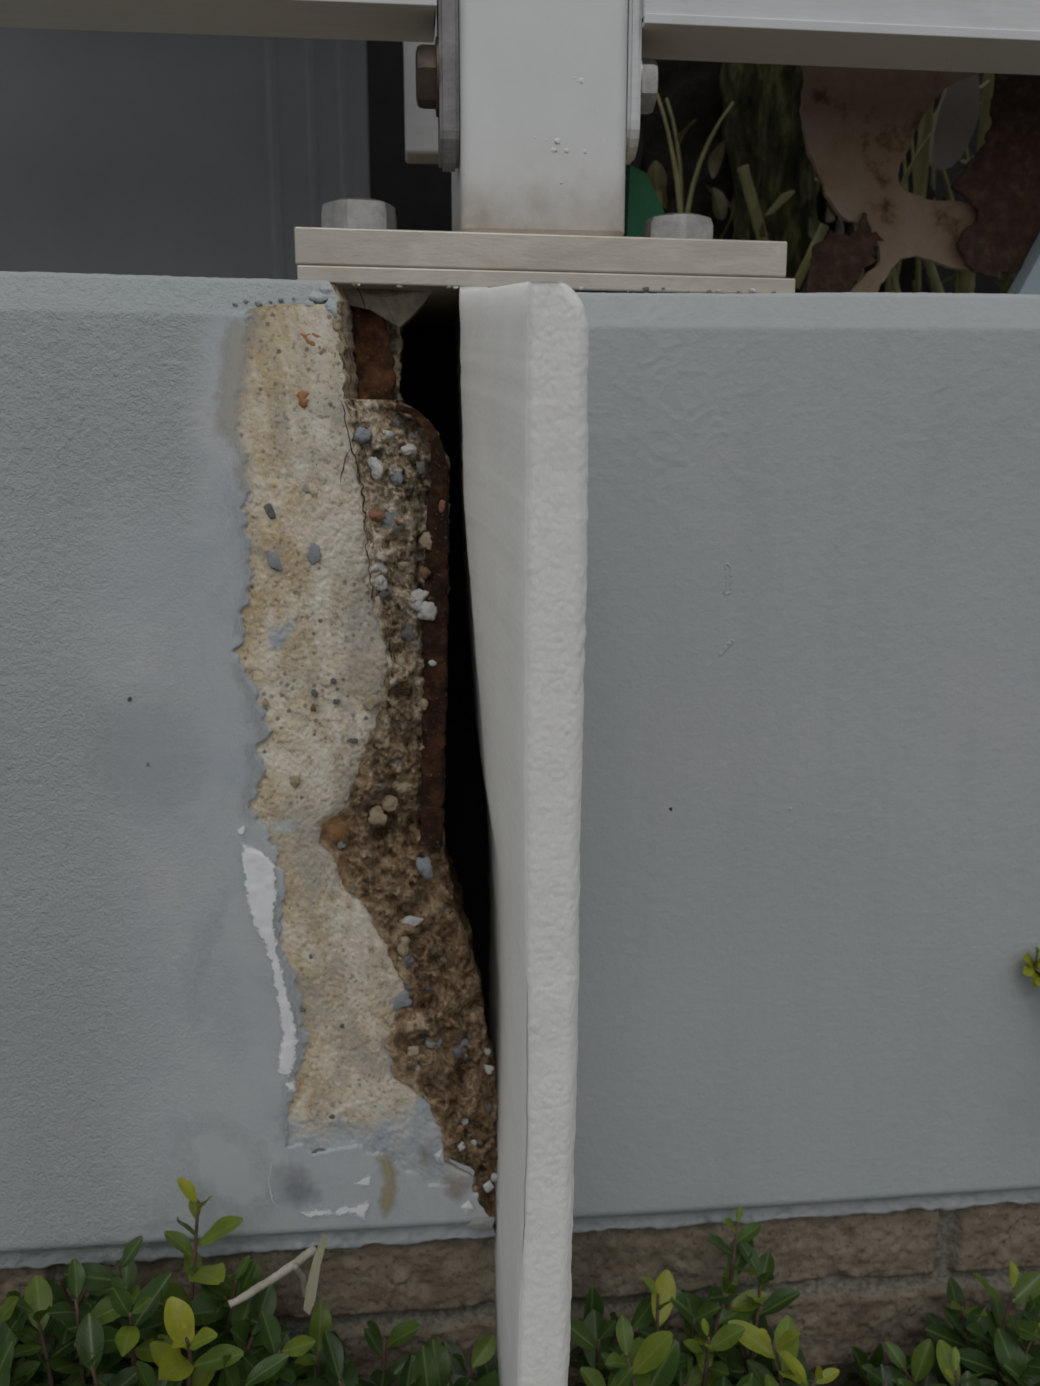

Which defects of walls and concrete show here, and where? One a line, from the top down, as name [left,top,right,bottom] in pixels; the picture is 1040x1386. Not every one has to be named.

spalling [220,284,498,1230]
rust [353,307,450,847]
rust [381,1158,394,1210]